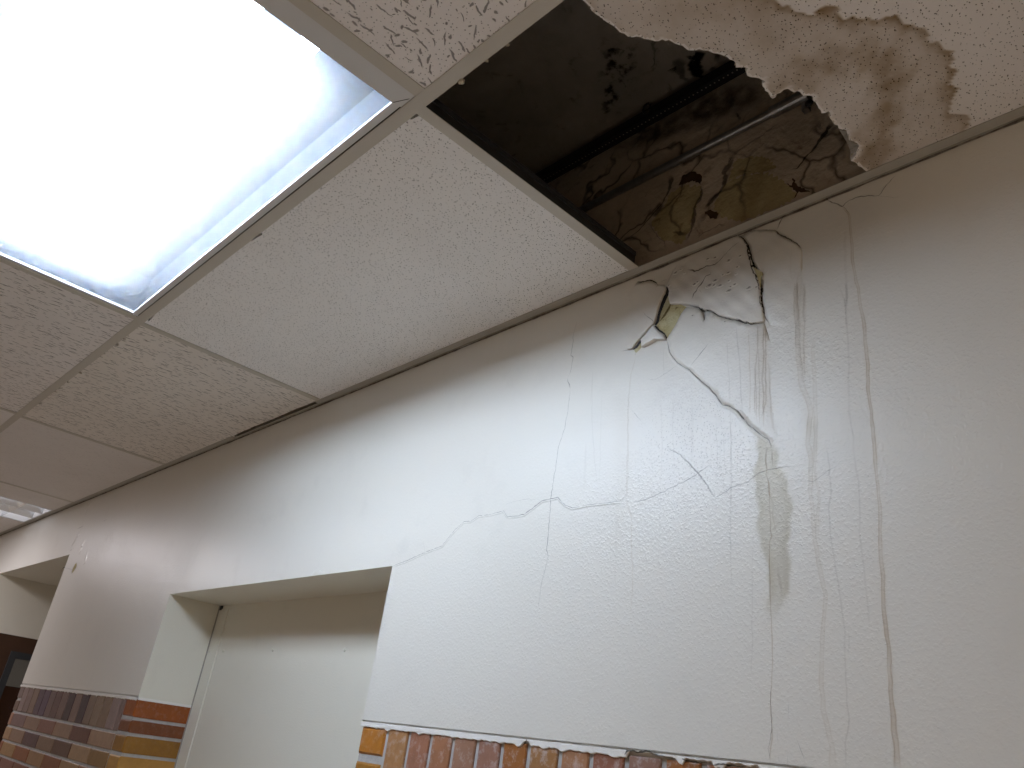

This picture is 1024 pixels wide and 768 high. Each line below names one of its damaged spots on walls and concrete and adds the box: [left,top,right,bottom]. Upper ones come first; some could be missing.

flaking render [652,156,810,244]
crack [691,219,800,325]
flaking render [620,281,686,353]
crack [666,342,772,447]
crack [393,497,621,567]
peeling [625,750,746,767]